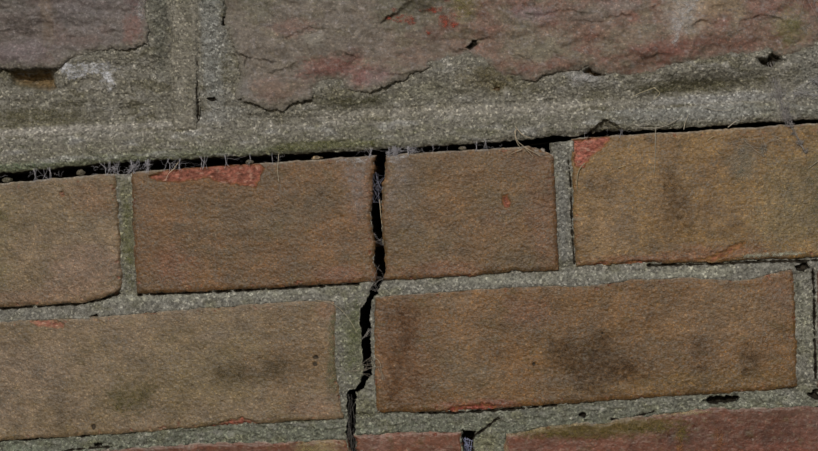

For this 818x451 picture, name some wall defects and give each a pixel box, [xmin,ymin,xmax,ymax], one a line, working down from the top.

spalling [572,119,623,168]
spalling [150,164,265,188]
crack [0,119,818,451]